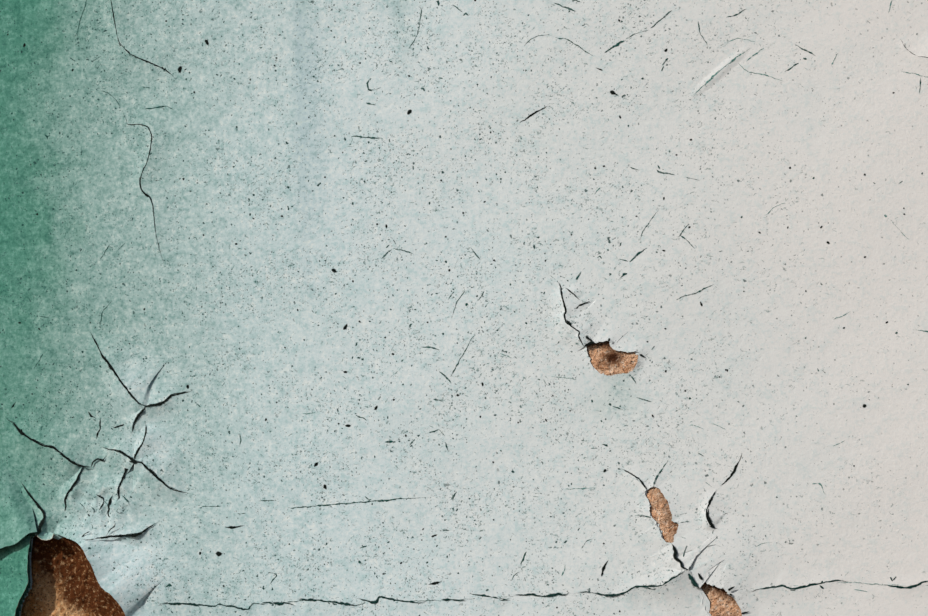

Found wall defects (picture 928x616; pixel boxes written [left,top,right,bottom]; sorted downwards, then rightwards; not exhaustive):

crack [70,0,184,266]
crack [2,302,423,546]
spalling [580,317,652,382]
spalling [0,459,165,616]
crack [162,454,928,616]
spalling [634,472,700,552]
spalling [699,562,759,616]